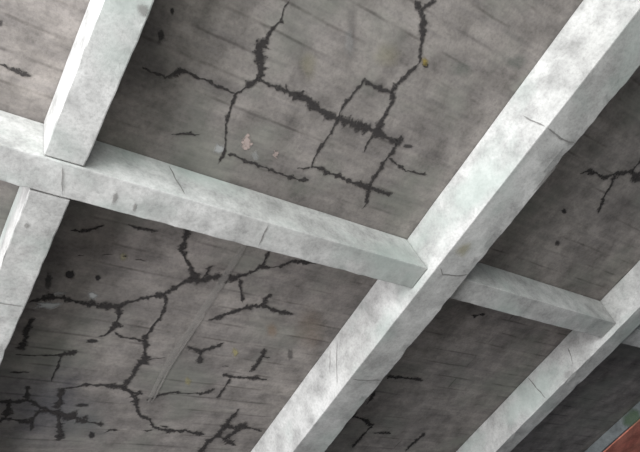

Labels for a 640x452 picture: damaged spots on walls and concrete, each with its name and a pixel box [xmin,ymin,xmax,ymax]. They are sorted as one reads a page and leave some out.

crack [0,64,30,77]
crack [142,0,436,209]
spalling [241,134,253,150]
crack [580,160,640,213]
crack [70,225,102,233]
crack [128,224,158,233]
crack [0,228,316,452]
crack [352,375,422,448]
crack [405,433,425,451]